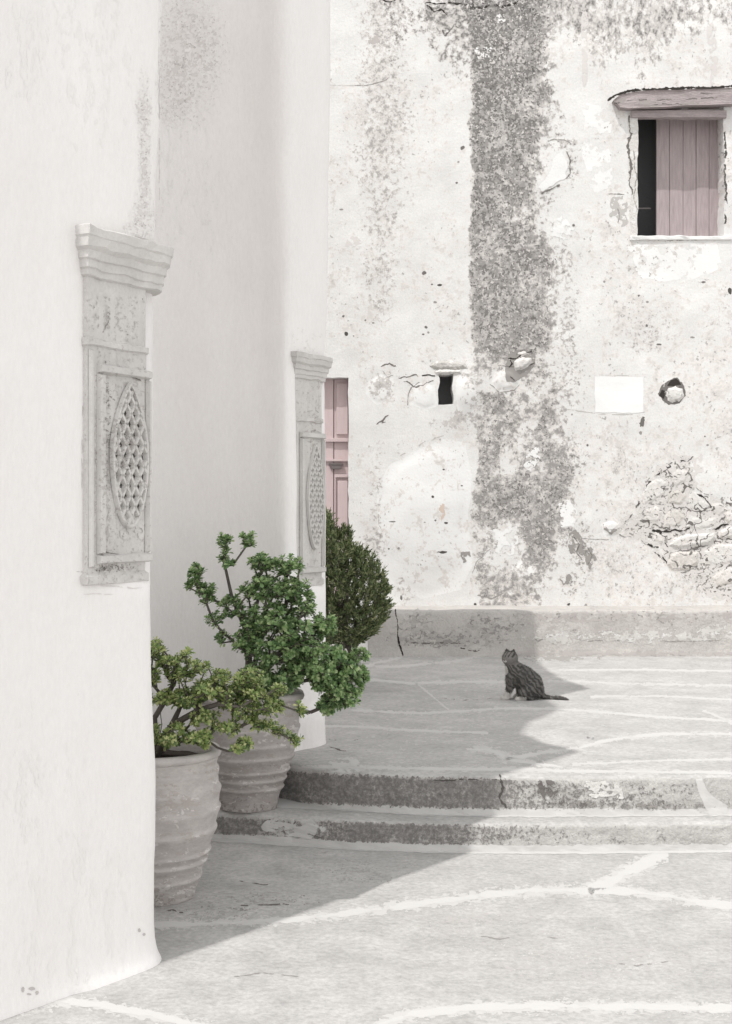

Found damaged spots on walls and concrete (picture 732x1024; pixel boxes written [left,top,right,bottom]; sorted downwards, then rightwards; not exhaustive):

peeling [539,151,568,191]
crack [607,85,732,224]
spalling [505,349,536,382]
crack [376,363,435,425]
leakage [279,0,732,811]
flaking render [658,378,686,405]
crack [574,456,732,596]
crack [395,609,480,656]
crack [434,774,507,808]